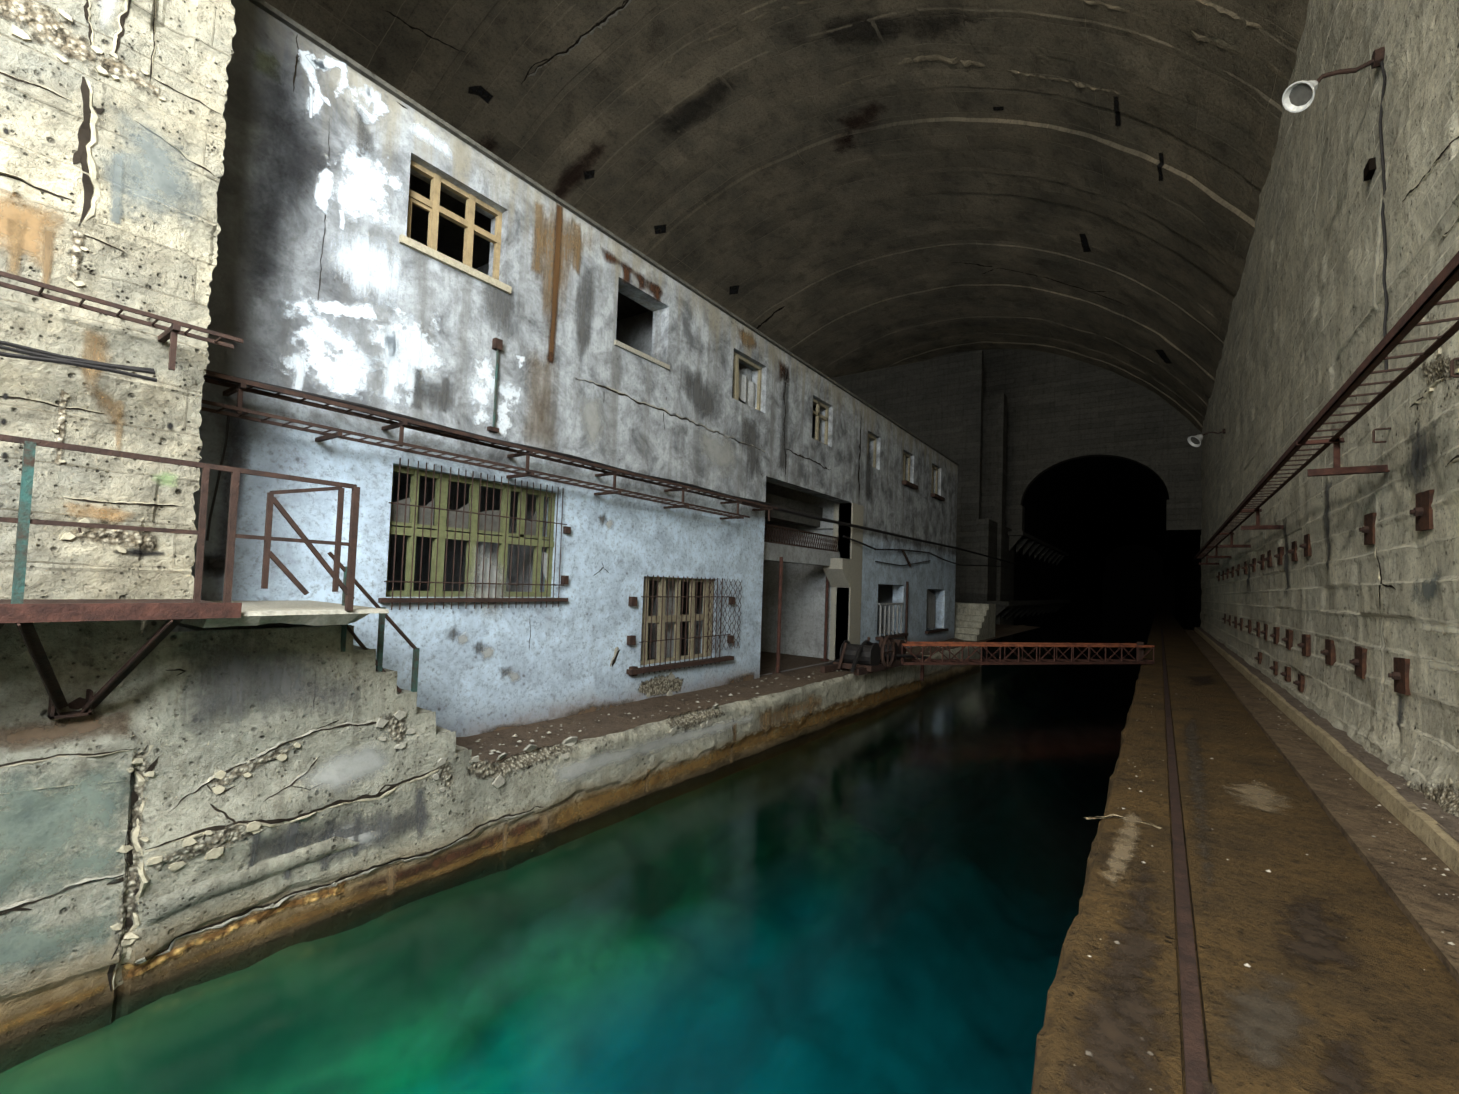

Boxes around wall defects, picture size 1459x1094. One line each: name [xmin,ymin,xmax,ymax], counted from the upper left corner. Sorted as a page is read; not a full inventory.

peeling [306,54,407,109]
crack [521,0,632,84]
crack [0,0,220,253]
peeling [314,163,334,215]
peeling [353,157,403,206]
corrosion [0,200,62,284]
corrosion [533,145,601,363]
peeling [286,297,377,395]
peeling [383,330,406,364]
crack [0,672,547,991]